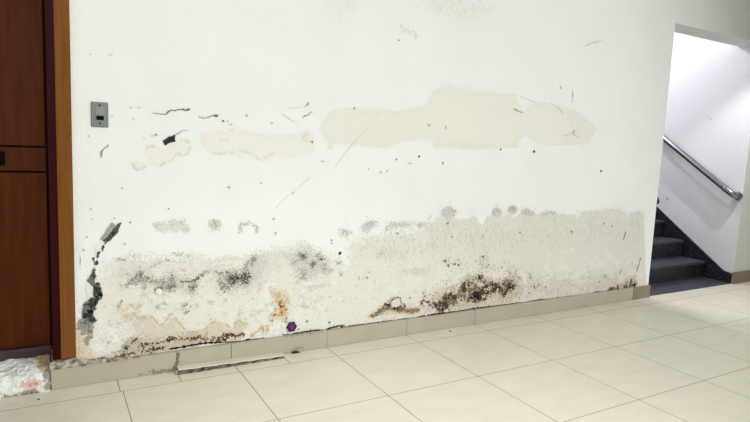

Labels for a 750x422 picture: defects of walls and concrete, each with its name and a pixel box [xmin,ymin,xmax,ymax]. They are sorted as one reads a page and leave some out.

crack [156,108,219,119]
peeling [320,85,597,150]
leakage [69,0,649,359]
spalling [76,218,131,345]
rust [268,287,293,326]